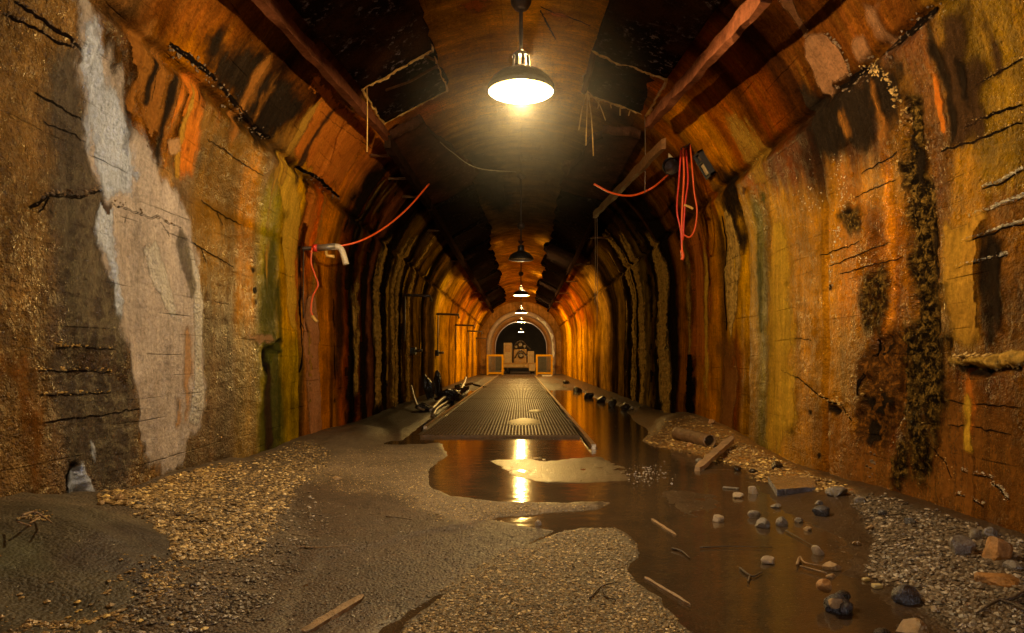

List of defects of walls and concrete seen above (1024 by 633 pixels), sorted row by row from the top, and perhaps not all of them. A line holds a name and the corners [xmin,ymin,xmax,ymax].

crack [3,1,84,53]
crack [941,101,1023,152]
leakage [51,0,206,492]
crack [30,184,233,267]
crack [821,239,901,274]
leakage [942,210,1001,347]
crack [958,166,1024,268]
crack [28,341,143,425]
leakage [264,368,281,450]
crack [781,370,852,421]